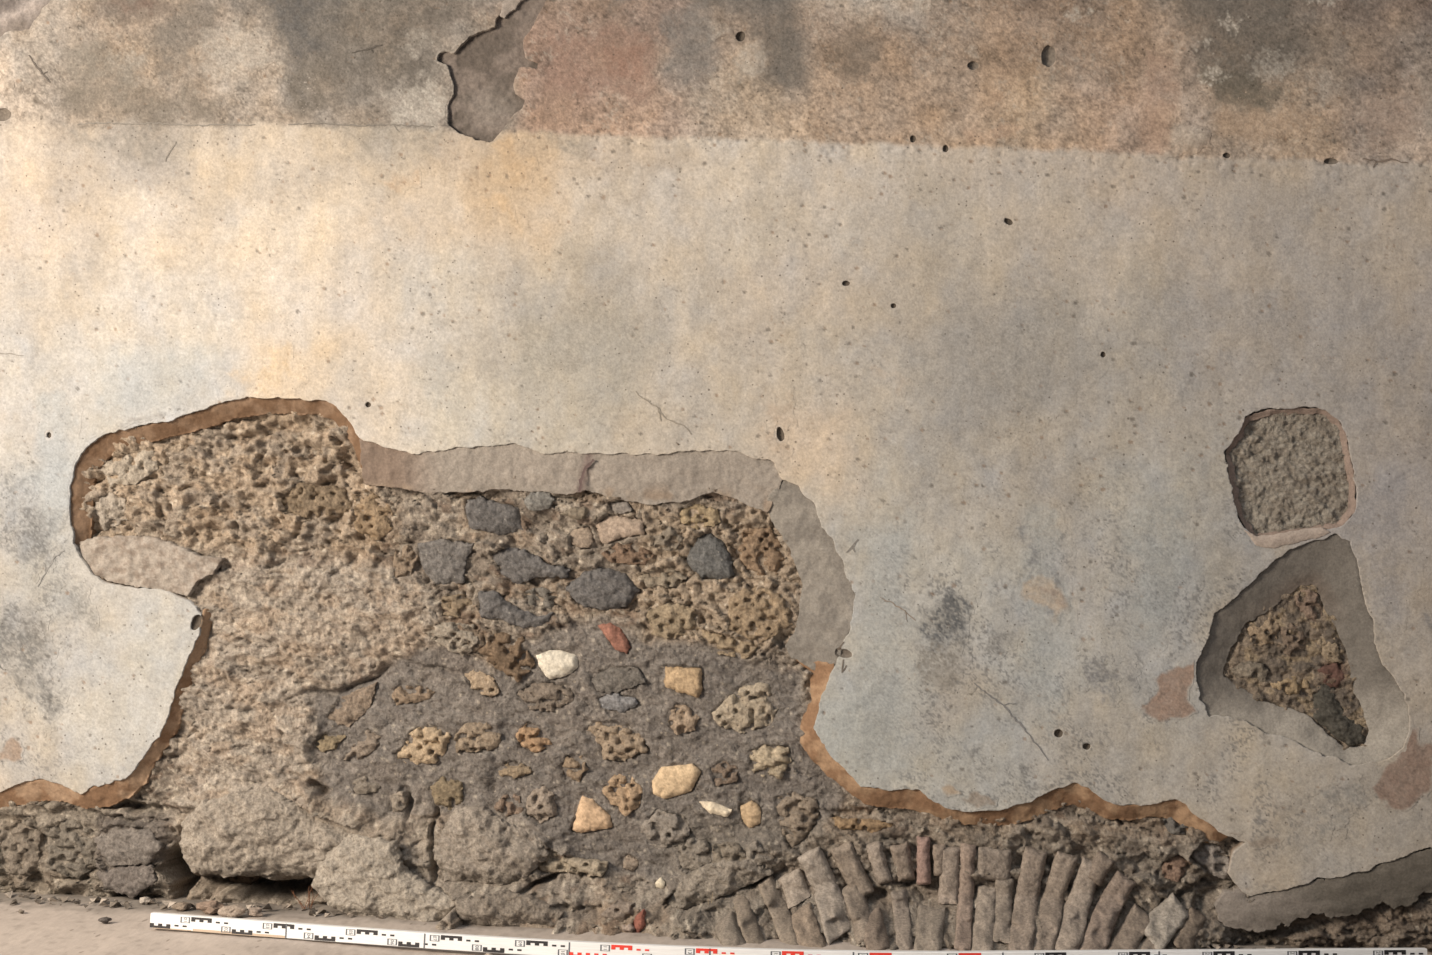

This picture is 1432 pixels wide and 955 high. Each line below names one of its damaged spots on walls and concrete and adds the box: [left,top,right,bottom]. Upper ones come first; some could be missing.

damp [47,0,502,172]
spalling [438,0,546,142]
damp [600,0,894,110]
spalling [0,397,1432,952]